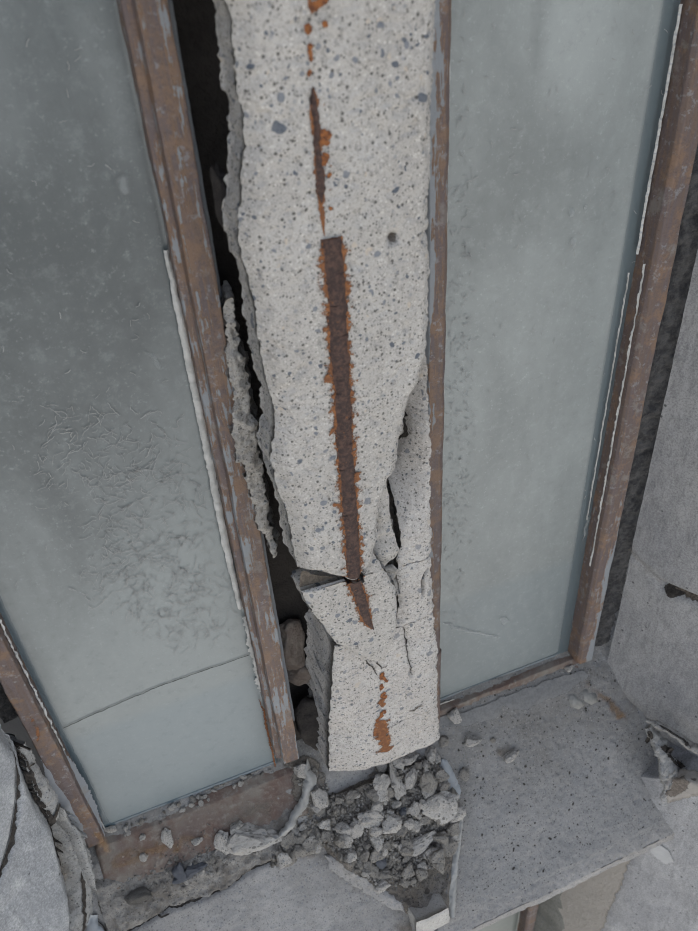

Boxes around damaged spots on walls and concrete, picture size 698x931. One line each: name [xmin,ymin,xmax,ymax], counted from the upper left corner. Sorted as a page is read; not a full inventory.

rust [304,0,333,236]
spalling [221,280,280,558]
spalling [316,236,399,630]
crack [299,570,367,587]
crack [0,740,271,931]
peeling [278,759,317,839]
rust [372,672,394,754]
spalling [322,758,453,914]
spalling [645,718,698,755]
spalling [665,769,698,803]